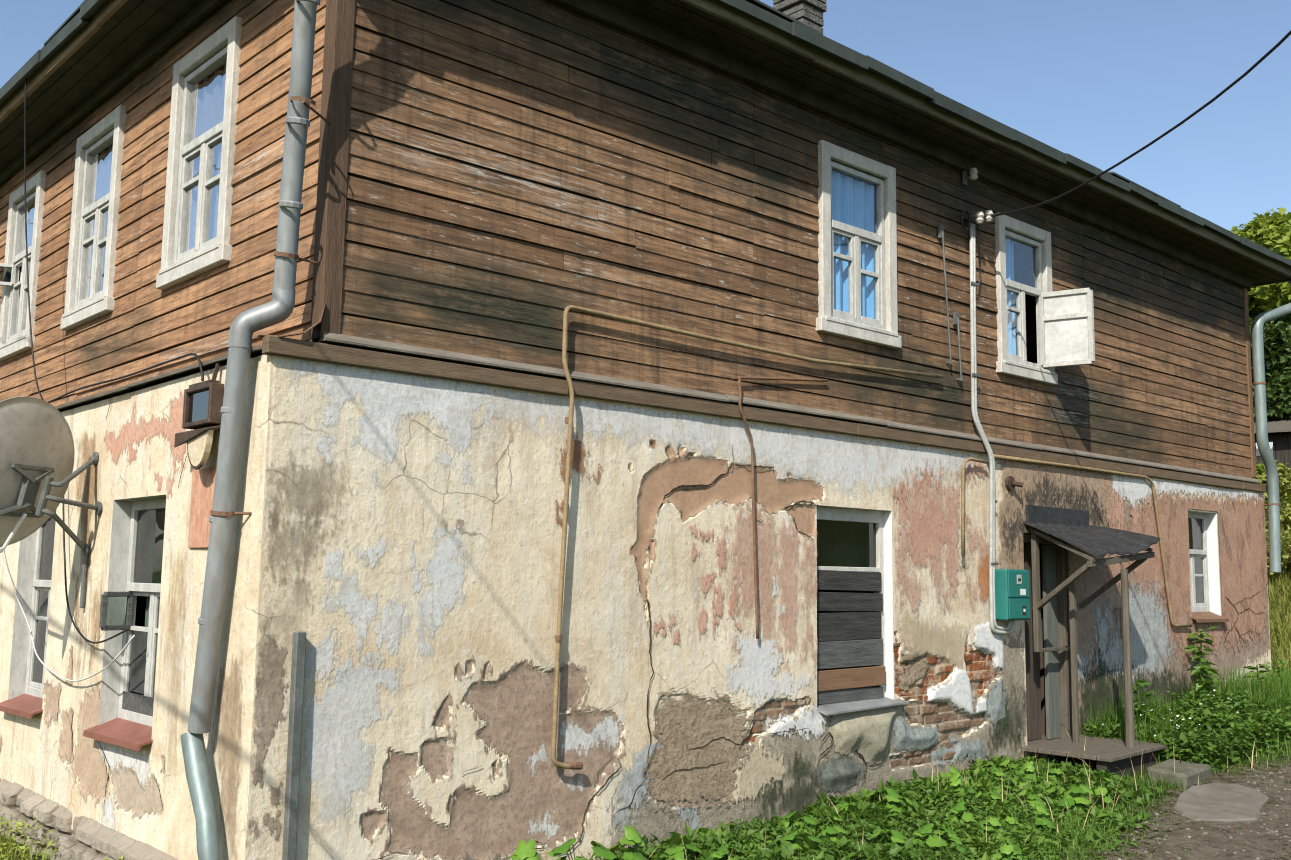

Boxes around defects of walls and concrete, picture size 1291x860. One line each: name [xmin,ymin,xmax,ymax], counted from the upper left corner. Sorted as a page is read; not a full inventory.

leakage [266,453,327,569]
crack [657,445,774,514]
crack [758,501,826,540]
leakage [1003,473,1113,569]
spalling [42,646,165,819]
leakage [216,659,242,855]
spalling [248,521,629,860]
crack [535,596,742,852]
spalling [629,439,827,820]
crack [772,728,883,783]
peeling [886,453,1004,768]
crack [1223,593,1263,647]